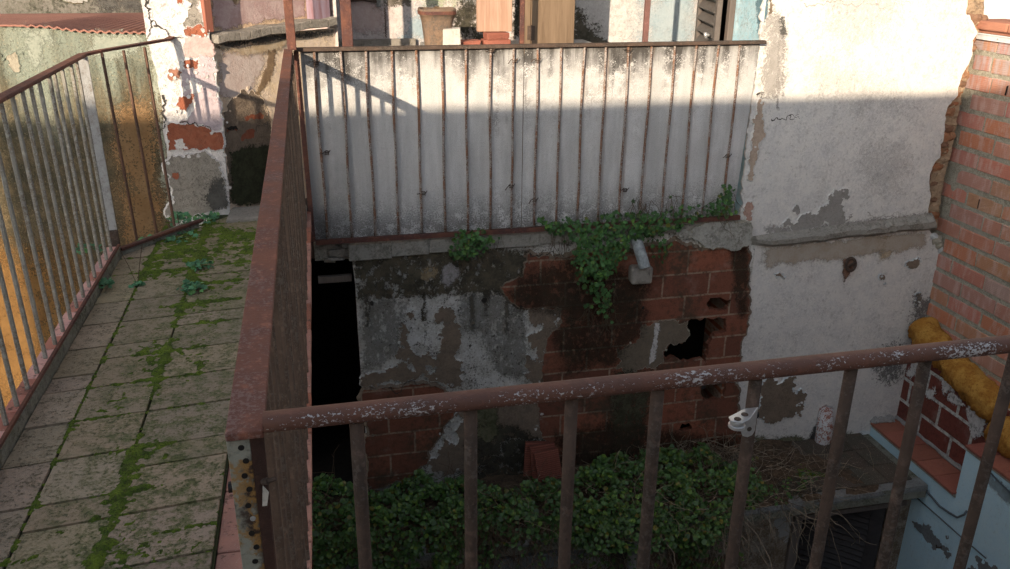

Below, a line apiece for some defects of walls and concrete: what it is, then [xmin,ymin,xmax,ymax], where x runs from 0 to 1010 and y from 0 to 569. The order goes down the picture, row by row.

water stain [383,0,423,39]
water stain [425,0,483,40]
spalling [966,0,989,52]
flaking render [161,0,306,224]
water stain [204,144,269,211]
peeling [782,187,855,231]
spalling [928,65,970,253]
flaking render [500,200,754,383]
peeling [356,304,465,401]
flaking render [661,382,742,450]
peeling [758,376,808,425]
flaking render [364,412,464,490]